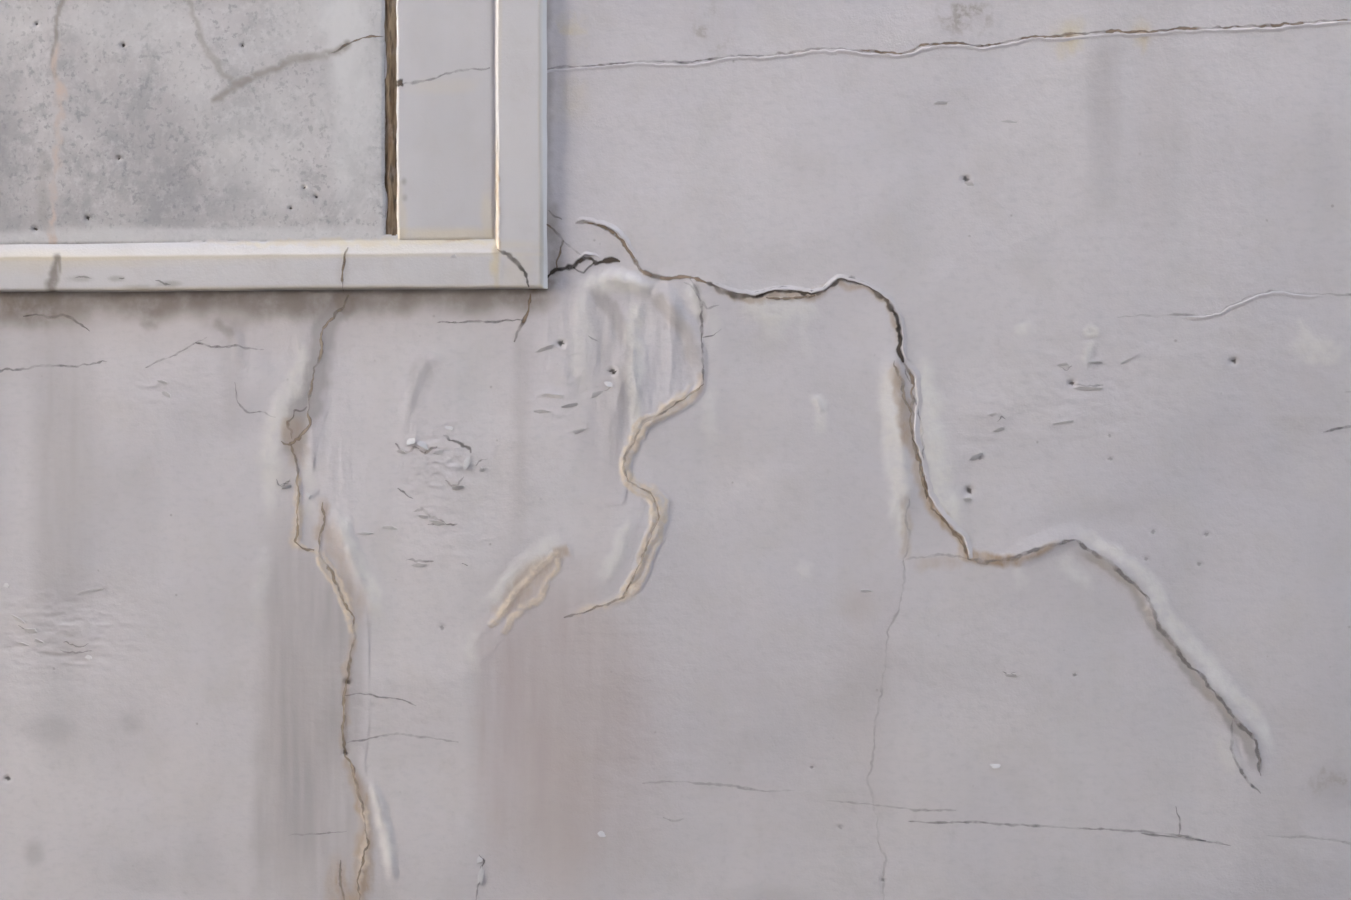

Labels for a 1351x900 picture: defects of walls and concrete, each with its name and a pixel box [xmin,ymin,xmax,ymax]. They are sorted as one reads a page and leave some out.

crack [48,0,73,81]
crack [182,0,382,106]
crack [547,19,1351,73]
damp [0,250,109,692]
damp [210,290,399,900]
crack [281,250,355,623]
crack [341,659,400,883]
damp [461,194,823,900]
crack [494,217,1261,789]
crack [1180,291,1322,321]